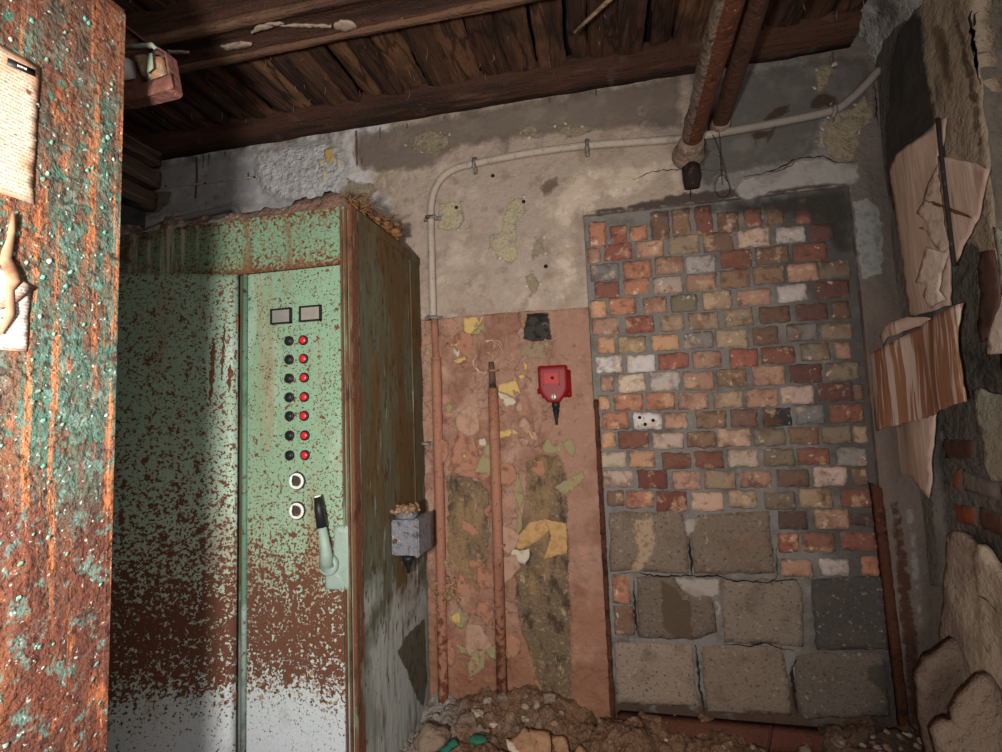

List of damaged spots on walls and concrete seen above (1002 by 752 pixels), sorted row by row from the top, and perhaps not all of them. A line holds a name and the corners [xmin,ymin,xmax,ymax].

crack [625,155,855,199]
spalling [437,201,464,232]
spalling [525,235,547,298]
spalling [852,198,884,280]
peeling [870,118,1002,690]
peeling [421,307,611,720]
crack [614,538,796,635]
crack [695,646,705,712]
crack [727,642,798,713]